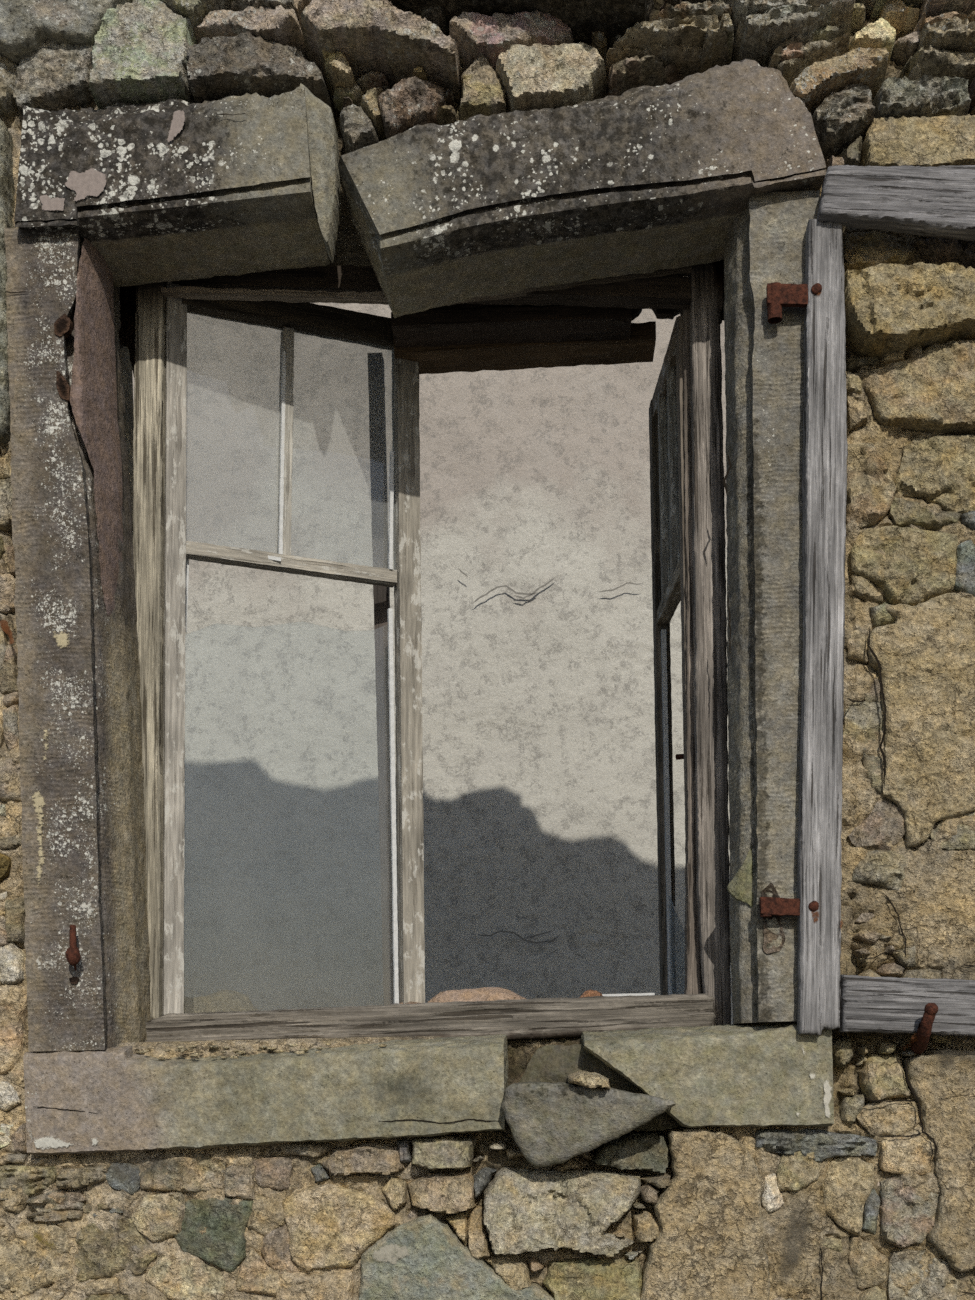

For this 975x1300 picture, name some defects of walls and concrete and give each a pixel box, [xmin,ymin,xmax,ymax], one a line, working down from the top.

crack [846,627,886,785]